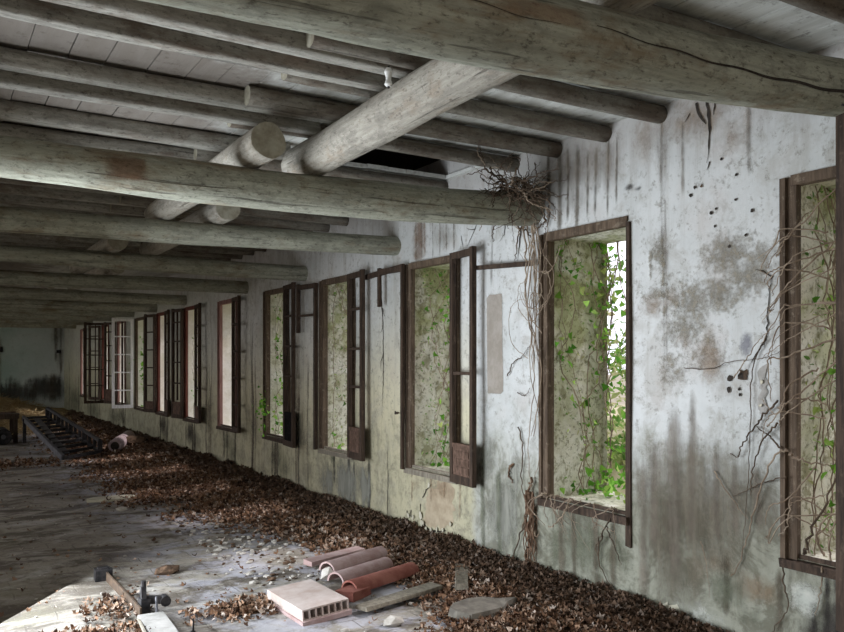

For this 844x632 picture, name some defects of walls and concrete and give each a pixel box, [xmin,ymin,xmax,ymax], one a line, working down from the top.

crack [597,25,844,93]
water stain [547,154,597,227]
water stain [643,237,768,359]
water stain [0,377,79,409]
water stain [651,451,765,589]
water stain [792,579,839,632]